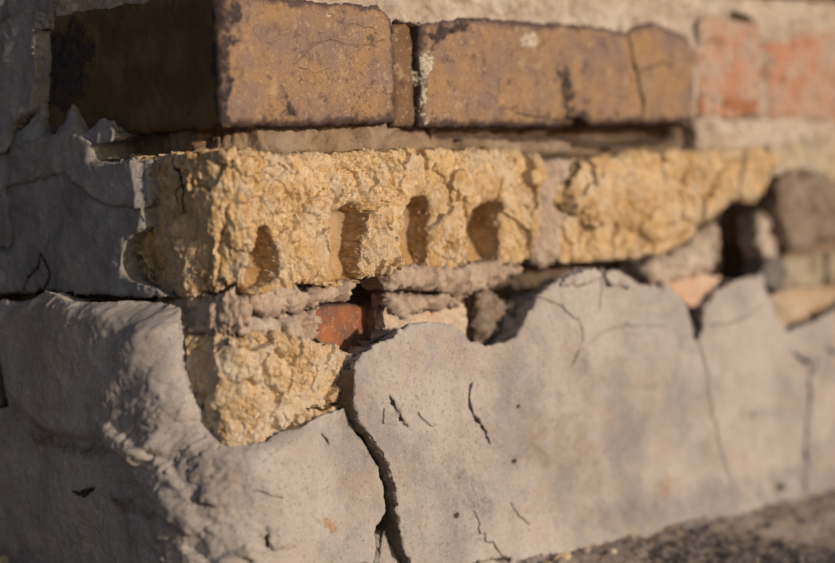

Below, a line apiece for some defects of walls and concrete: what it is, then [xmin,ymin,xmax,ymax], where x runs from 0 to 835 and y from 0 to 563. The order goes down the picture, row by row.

crack [624,31,675,119]
crack [171,153,185,214]
spalling [0,120,781,339]
spalling [185,327,353,447]
crack [308,369,434,563]
crack [468,382,491,444]
crack [696,305,763,504]
crack [793,346,835,493]